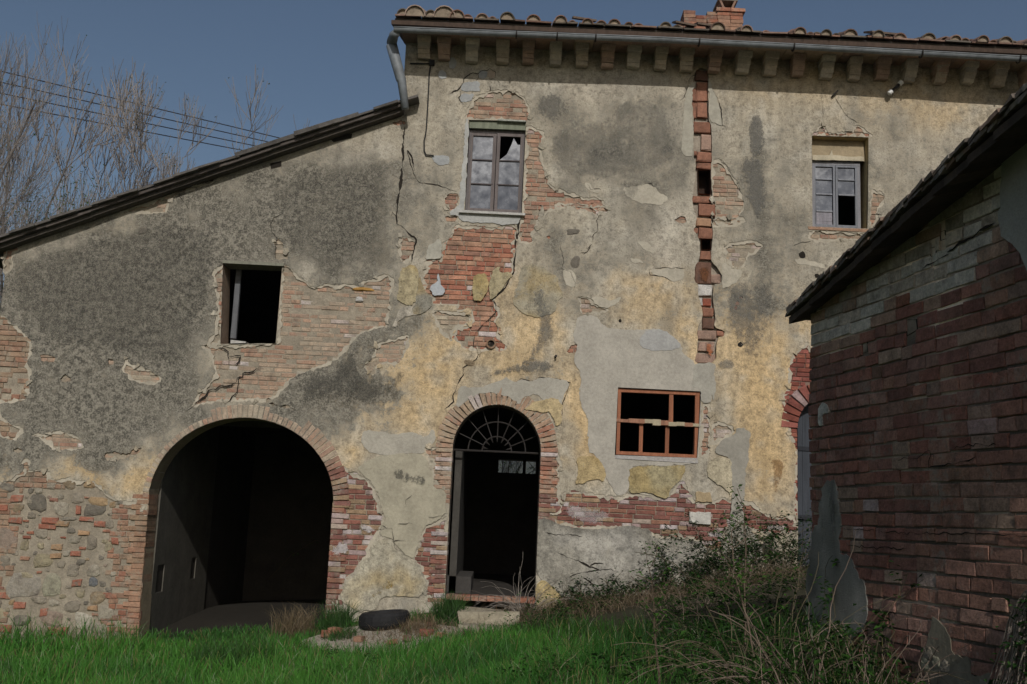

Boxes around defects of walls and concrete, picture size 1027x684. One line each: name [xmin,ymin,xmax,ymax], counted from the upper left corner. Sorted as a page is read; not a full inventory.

crack [391,127,454,262]
flaking render [396,89,610,354]
leakage [743,116,768,217]
flaking render [0,315,148,643]
flaking render [108,356,161,385]
crack [187,347,257,411]
flaking render [192,239,410,410]
flaking render [324,459,387,606]
flaking render [425,159,1027,684]